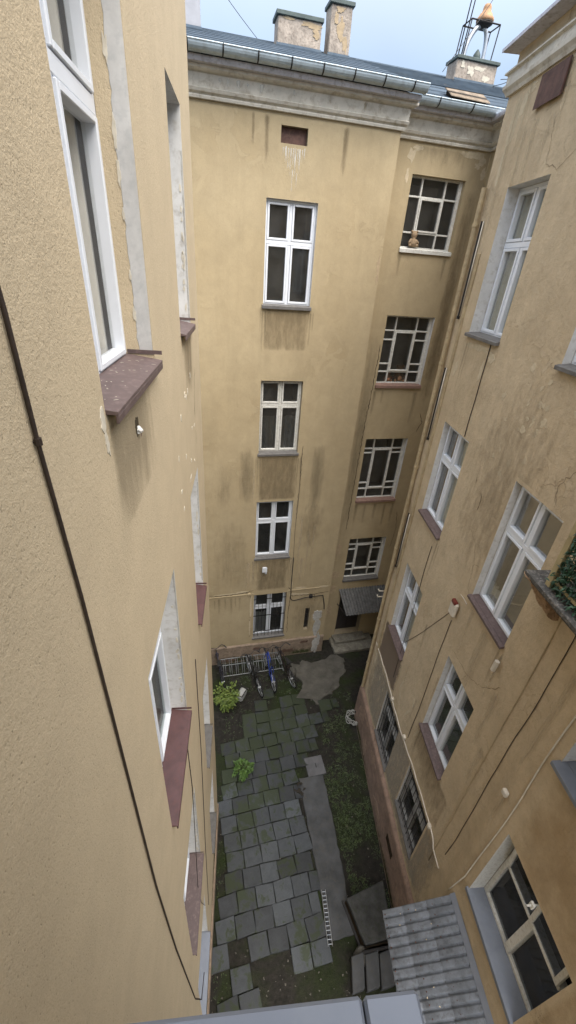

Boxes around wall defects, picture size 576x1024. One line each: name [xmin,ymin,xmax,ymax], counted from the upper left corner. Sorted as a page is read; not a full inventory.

flaking render [282,16,323,41]
flaking render [335,6,348,54]
flaking render [461,60,489,83]
peeling [101,0,153,355]